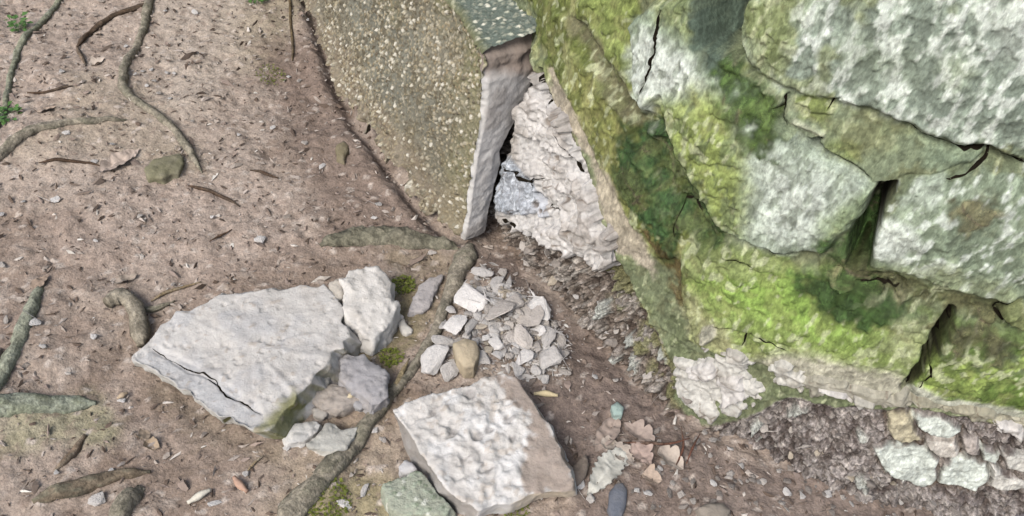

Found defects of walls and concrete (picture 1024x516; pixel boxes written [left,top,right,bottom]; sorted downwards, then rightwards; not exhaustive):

crack [637,11,661,101]
crack [912,124,1024,180]